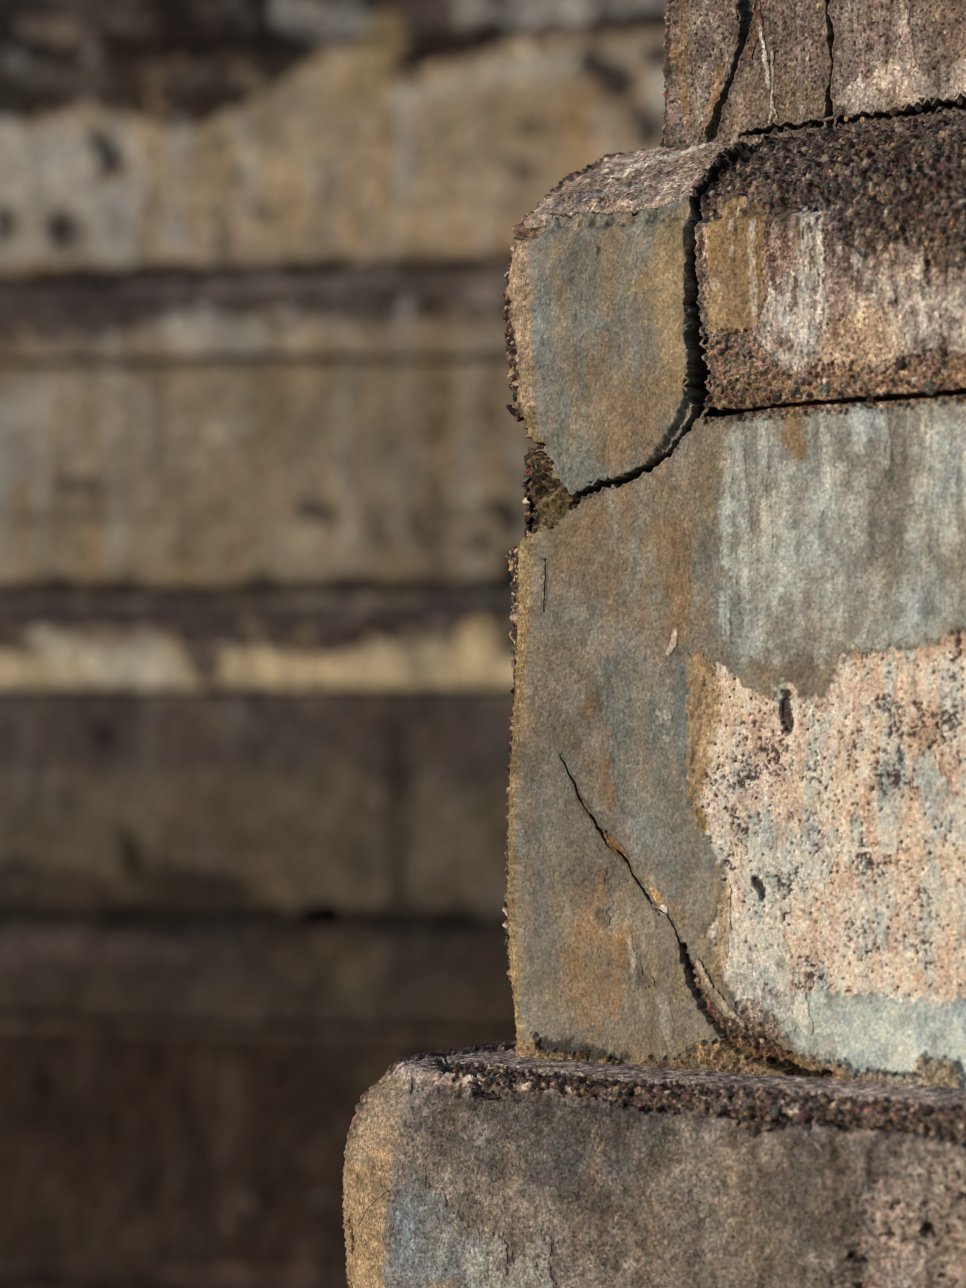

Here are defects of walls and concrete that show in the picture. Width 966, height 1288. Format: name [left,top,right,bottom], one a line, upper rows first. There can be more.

crack [822,0,843,131]
crack [559,754,695,976]
peeling [429,625,966,1288]